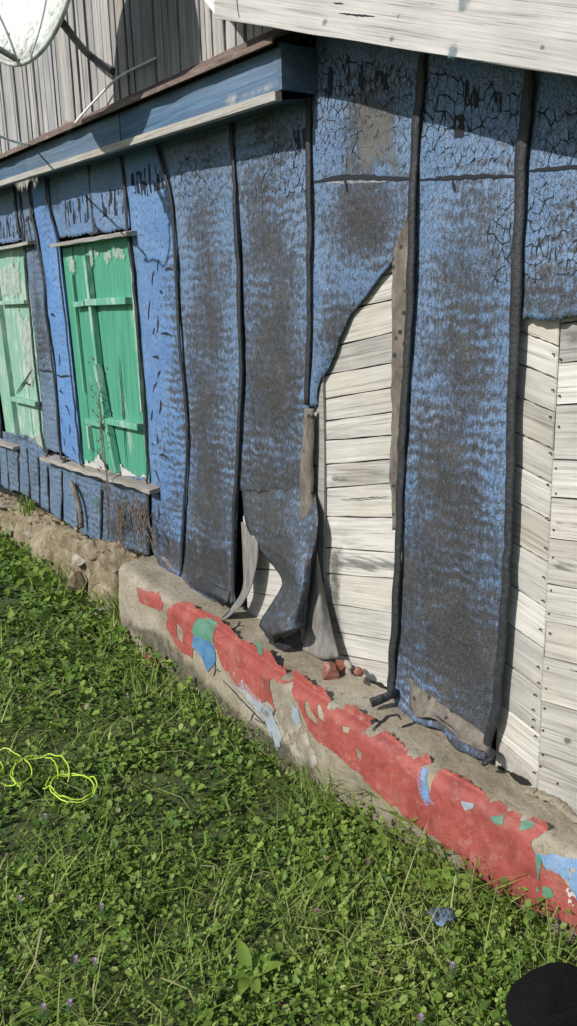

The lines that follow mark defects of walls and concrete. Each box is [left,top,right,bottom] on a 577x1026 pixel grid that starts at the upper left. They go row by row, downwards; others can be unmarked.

crack [174,94,577,289]
peeling [136,587,577,934]